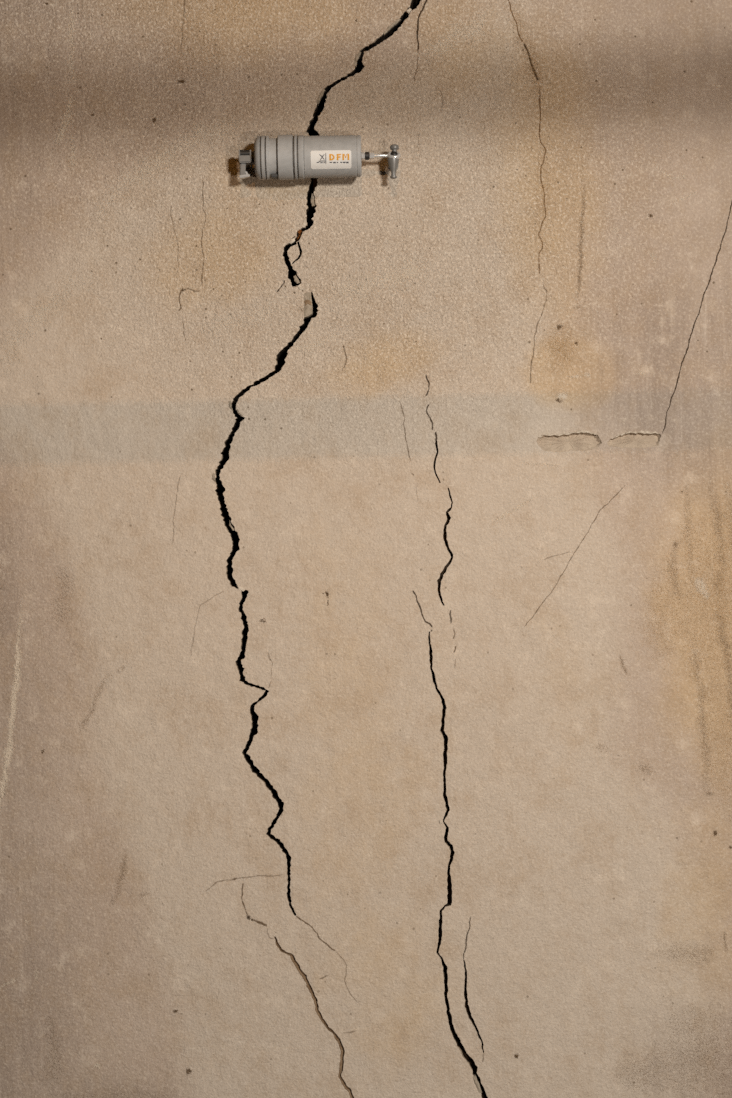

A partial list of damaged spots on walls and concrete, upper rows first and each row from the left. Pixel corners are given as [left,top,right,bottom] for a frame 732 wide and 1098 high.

crack [306,0,427,136]
crack [663,202,732,431]
crack [212,178,334,950]
crack [401,376,488,1098]
crack [234,878,354,1098]